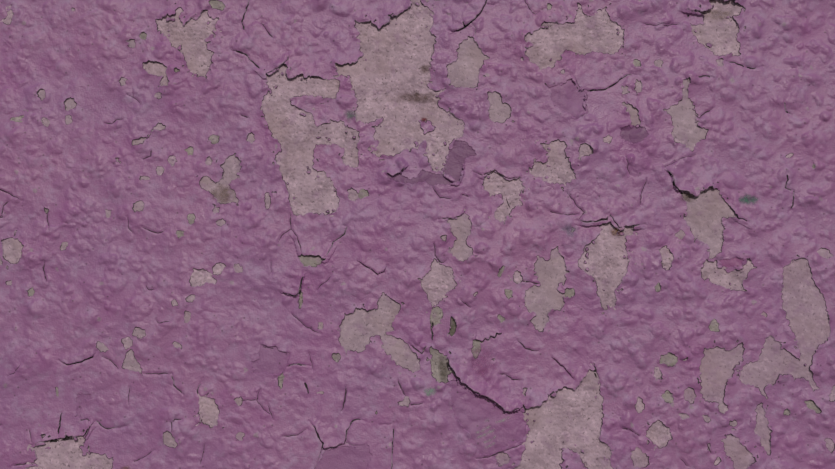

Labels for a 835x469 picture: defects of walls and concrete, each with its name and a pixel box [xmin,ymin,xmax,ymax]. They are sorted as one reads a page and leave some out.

peeling [143,0,225,99]
peeling [252,0,489,217]
crack [449,0,487,31]
peeling [521,3,624,118]
peeling [679,0,745,66]
peeling [475,140,593,223]
peeling [498,247,575,331]
peeling [571,191,645,314]
peeling [675,182,758,292]
peeling [26,394,113,469]
peeling [332,293,619,469]
peeling [684,255,830,469]